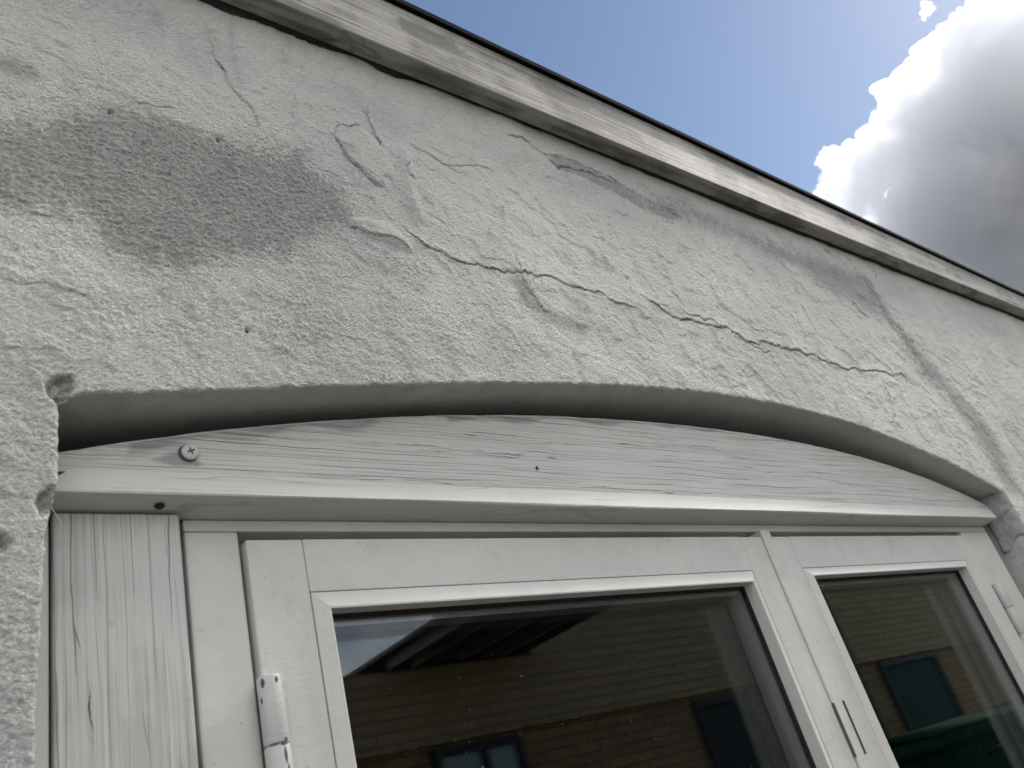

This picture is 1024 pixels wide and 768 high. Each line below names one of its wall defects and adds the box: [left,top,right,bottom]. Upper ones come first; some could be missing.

crack [336,111,390,192]
crack [507,132,609,185]
crack [405,228,908,395]